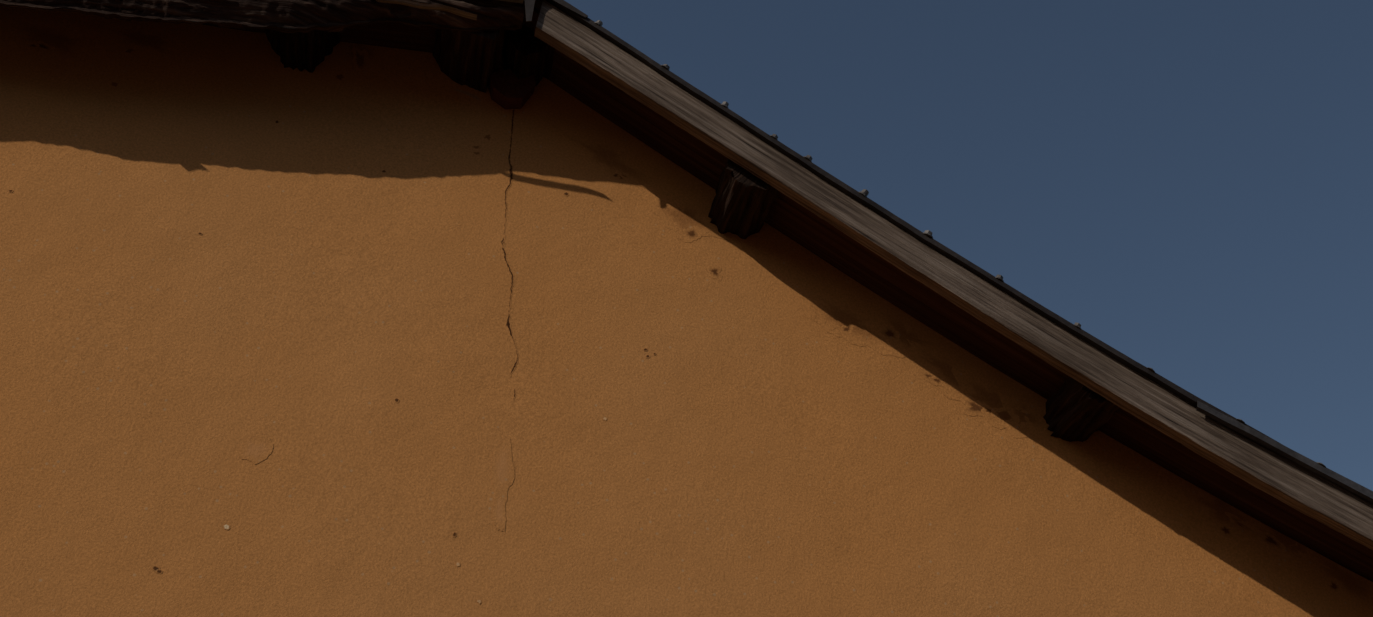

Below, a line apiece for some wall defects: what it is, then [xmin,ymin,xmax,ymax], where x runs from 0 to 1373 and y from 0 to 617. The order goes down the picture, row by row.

crack [501,109,519,399]